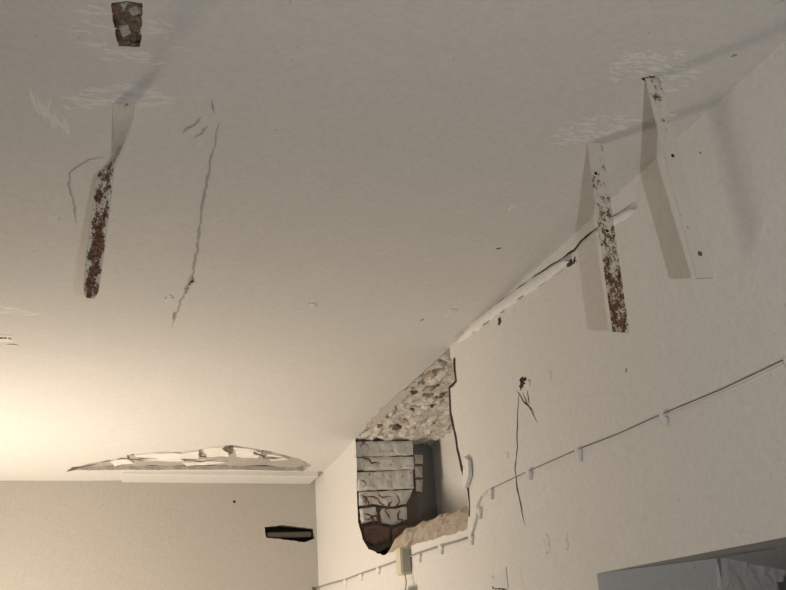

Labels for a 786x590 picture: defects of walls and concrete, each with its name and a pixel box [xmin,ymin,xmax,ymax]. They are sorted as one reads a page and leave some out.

rust [111,1,143,47]
crack [171,102,219,328]
spalling [67,445,311,472]
spalling [353,348,472,553]